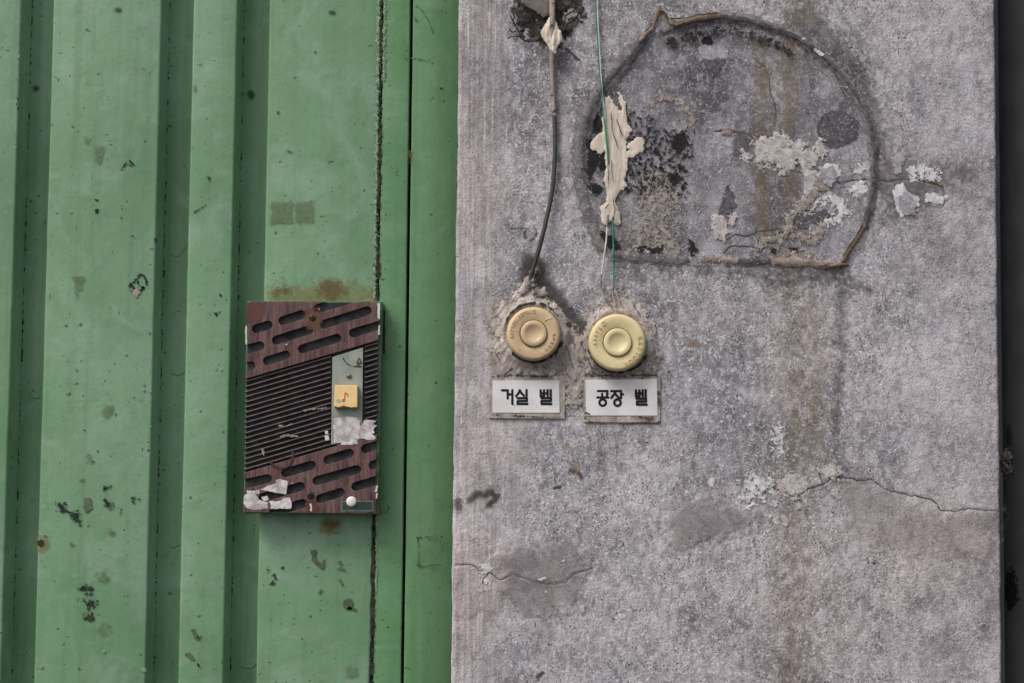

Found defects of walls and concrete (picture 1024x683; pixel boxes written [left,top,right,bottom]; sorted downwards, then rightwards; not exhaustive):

peeling [590,131,604,154]
spalling [615,137,739,263]
peeling [738,128,870,260]
peeling [891,152,949,218]
peeling [128,273,148,297]
peeling [55,484,140,527]
crack [763,464,1000,512]
peeling [75,571,108,623]
crack [456,564,595,584]